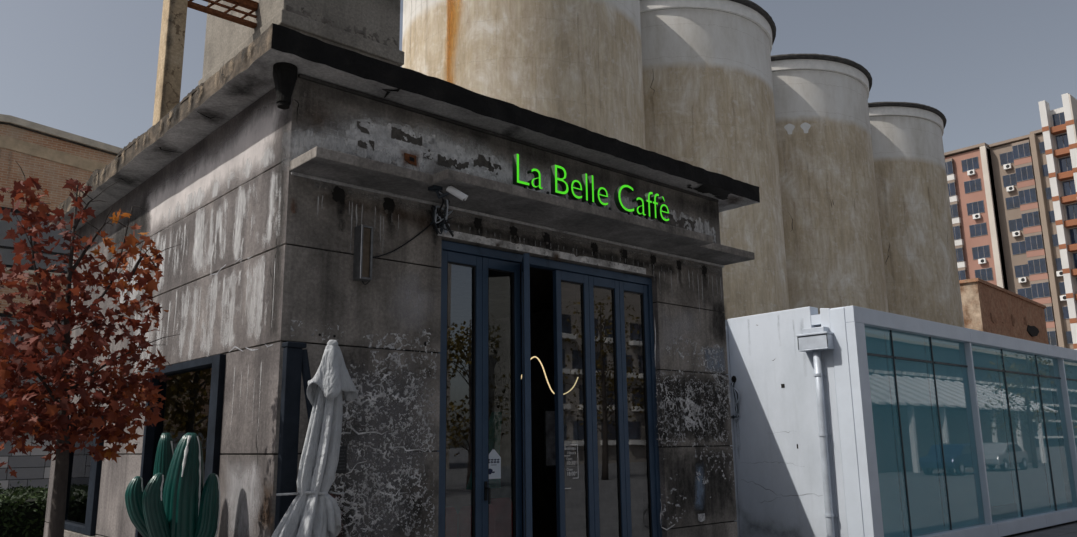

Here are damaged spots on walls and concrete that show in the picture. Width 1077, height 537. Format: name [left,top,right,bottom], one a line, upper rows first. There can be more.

peeling [297,117,506,182]
water stain [113,188,252,303]
water stain [137,125,286,358]
water stain [328,361,423,537]
water stain [658,374,737,521]